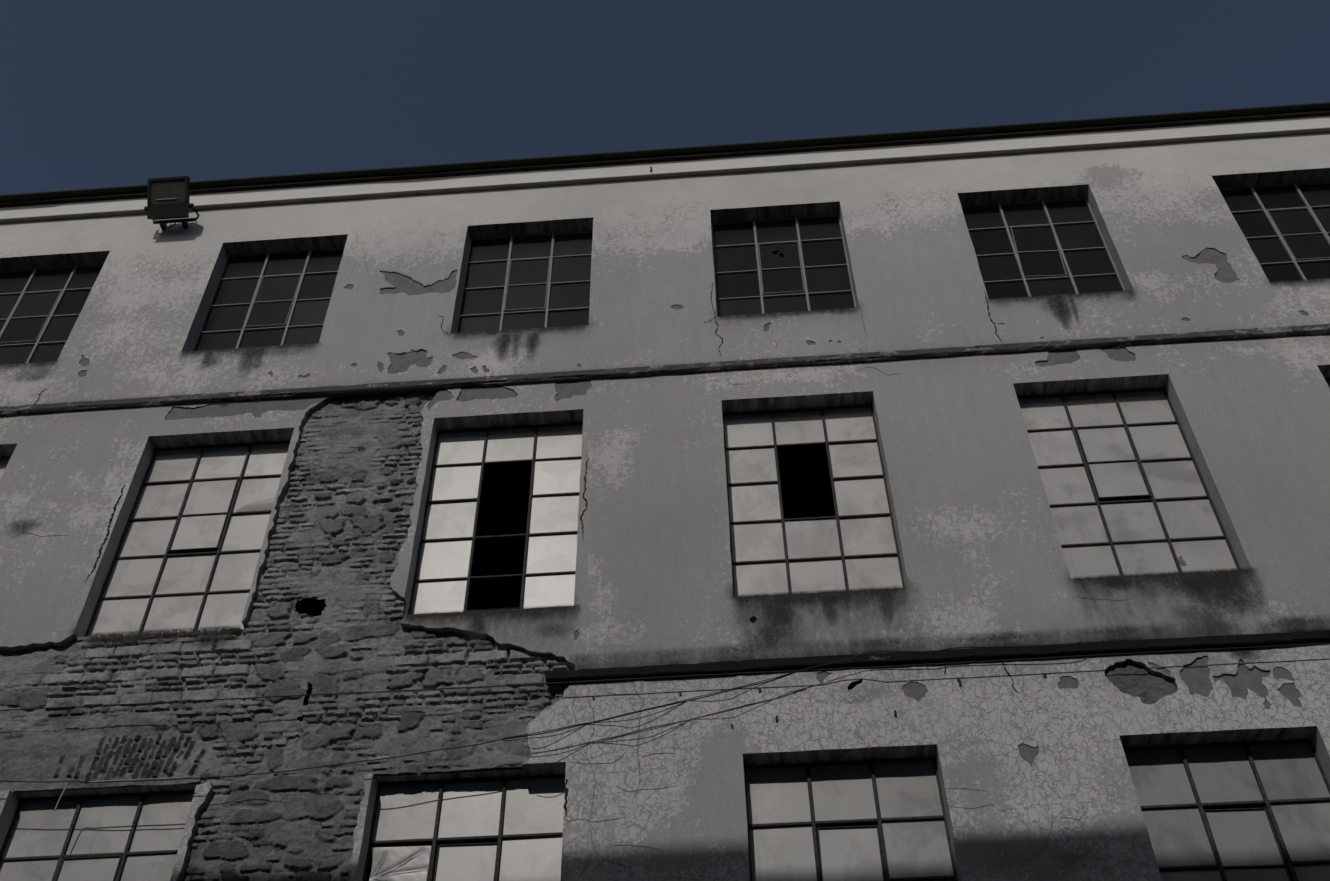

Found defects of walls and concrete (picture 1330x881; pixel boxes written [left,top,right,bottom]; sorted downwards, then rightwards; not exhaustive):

flaking render [379,269,458,296]
crack [709,281,730,383]
crack [984,292,1005,343]
flaking render [1182,247,1238,283]
flaking render [555,364,592,402]
crack [85,485,125,582]
spalling [0,331,575,881]
water stain [573,586,920,664]
water stain [936,568,1252,645]
water stain [1260,617,1330,629]
spalling [1104,654,1302,709]
crack [563,683,704,880]